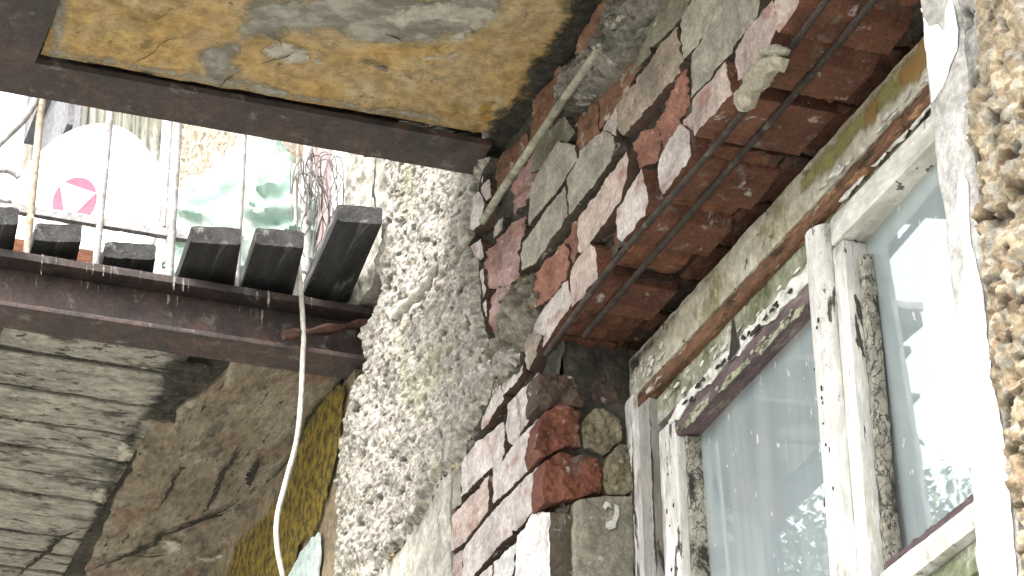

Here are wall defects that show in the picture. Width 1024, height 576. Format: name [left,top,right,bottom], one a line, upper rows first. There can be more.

peeling [263,43,321,63]
damp [485,0,603,155]
peeling [819,157,853,191]
damp [800,41,922,193]
rust [862,99,877,131]
peeling [838,0,958,202]
rust [897,40,927,86]
peeling [663,264,819,431]
crack [86,444,259,571]